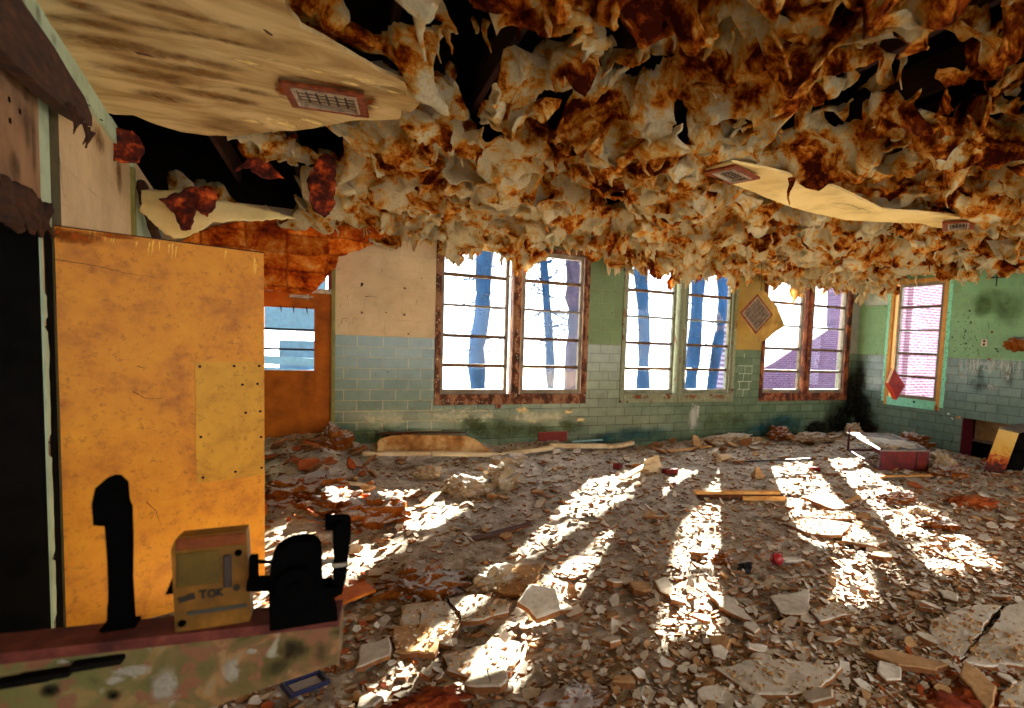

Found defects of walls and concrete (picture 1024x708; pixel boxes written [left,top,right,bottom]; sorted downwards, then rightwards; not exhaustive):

leakage [747,364,877,435]
spalling [947,413,974,456]
crack [962,605,1006,657]